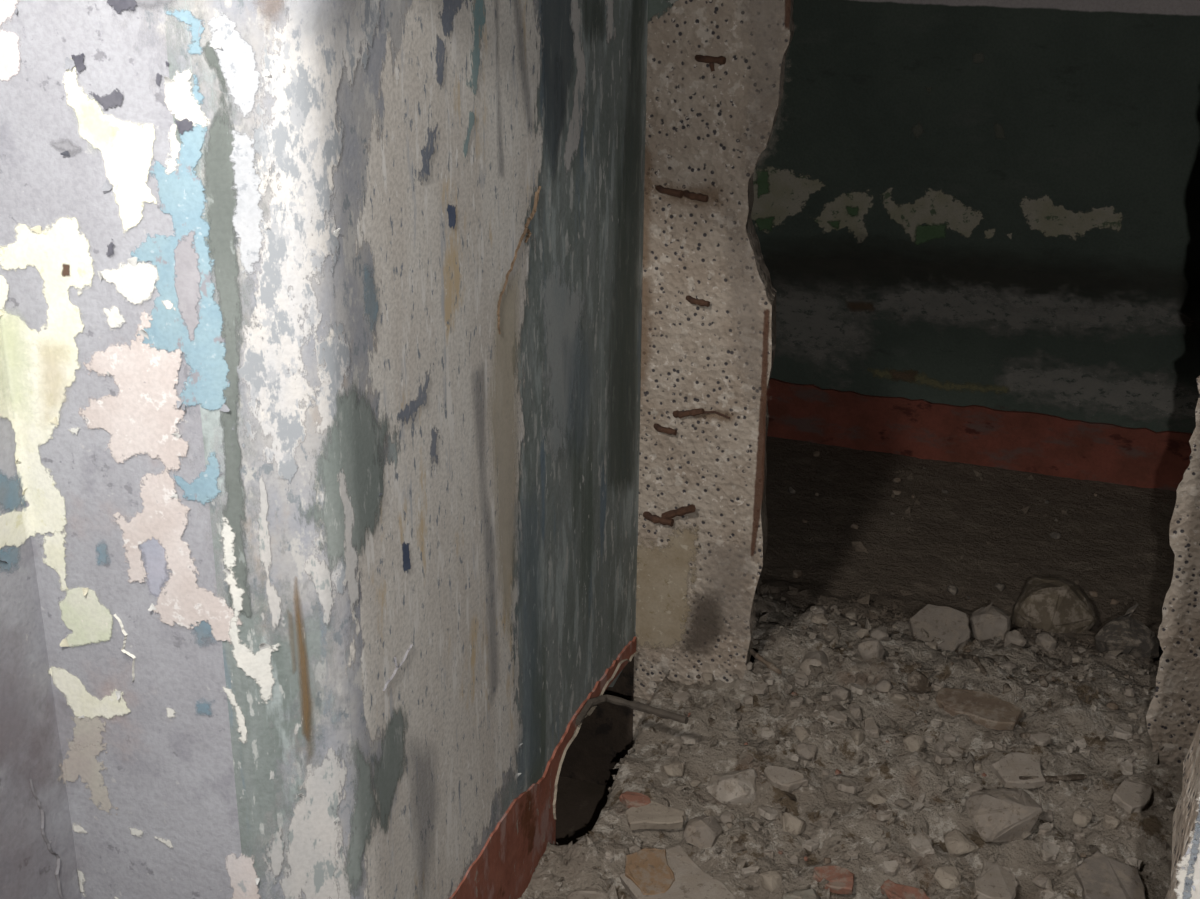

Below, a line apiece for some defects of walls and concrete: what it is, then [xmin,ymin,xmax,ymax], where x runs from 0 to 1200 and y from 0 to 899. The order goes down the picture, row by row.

spalling [695,55,726,72]
spalling [655,185,709,202]
peeling [751,166,1012,245]
crack [497,186,541,334]
spalling [686,295,710,307]
peeling [0,0,544,899]
spalling [653,408,730,435]
spalling [636,504,723,654]
rust [295,594,309,738]
peeling [1174,797,1200,899]